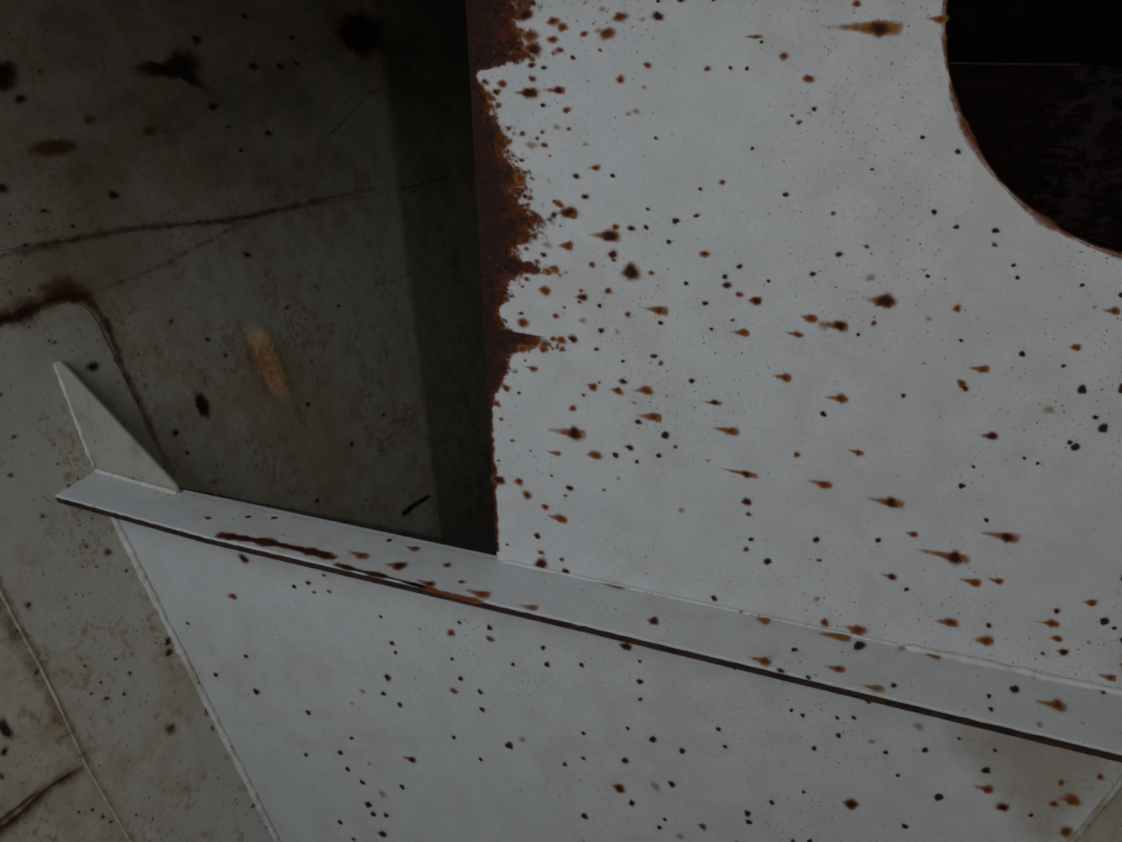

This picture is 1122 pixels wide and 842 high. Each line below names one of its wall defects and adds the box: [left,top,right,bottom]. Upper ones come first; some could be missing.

corrosion [580,13,627,39]
corrosion [487,9,567,102]
corrosion [518,336,577,353]
corrosion [0,278,158,444]
corrosion [215,532,490,603]
corrosion [535,551,564,568]
corrosion [821,619,866,641]
corrosion [1040,609,1068,656]
corrosion [752,657,784,673]
corrosion [1038,699,1066,711]
crack [0,768,83,835]
corrosion [1049,780,1080,807]